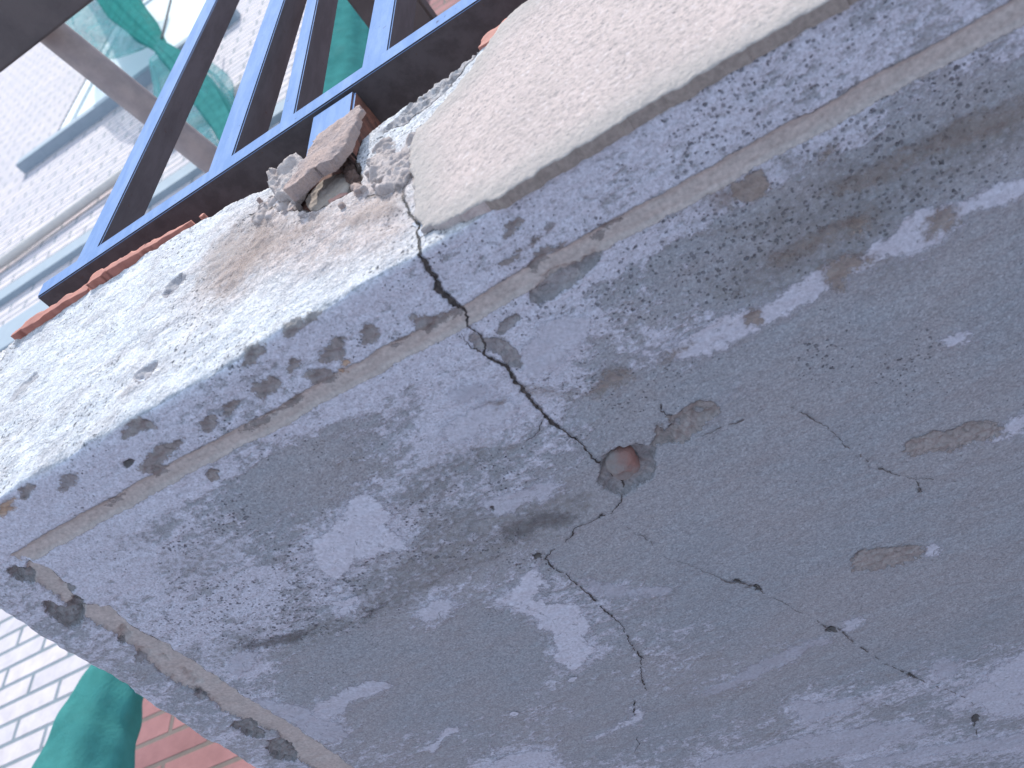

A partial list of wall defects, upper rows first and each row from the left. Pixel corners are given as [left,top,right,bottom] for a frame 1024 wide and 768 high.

spalling [279,141,363,212]
spalling [597,400,721,495]
crack [366,186,978,753]
spalling [902,414,1024,457]
spalling [6,565,36,582]
spalling [850,543,943,573]
spalling [43,582,85,627]